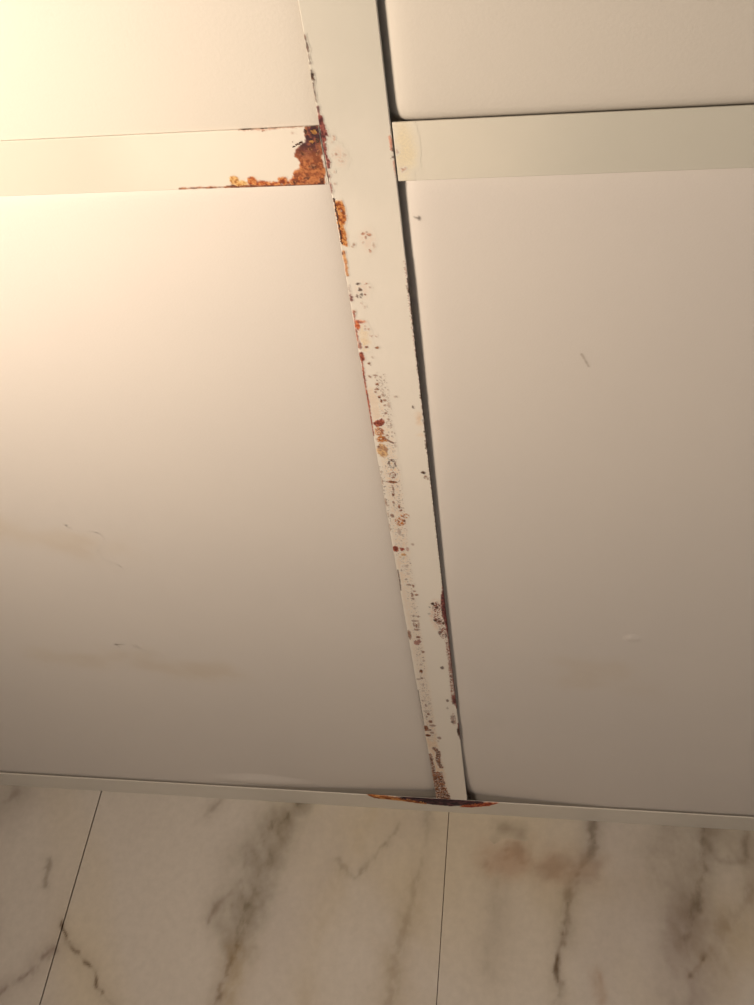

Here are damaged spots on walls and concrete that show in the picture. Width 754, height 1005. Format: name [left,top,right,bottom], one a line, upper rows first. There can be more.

rust [178,33,500,808]